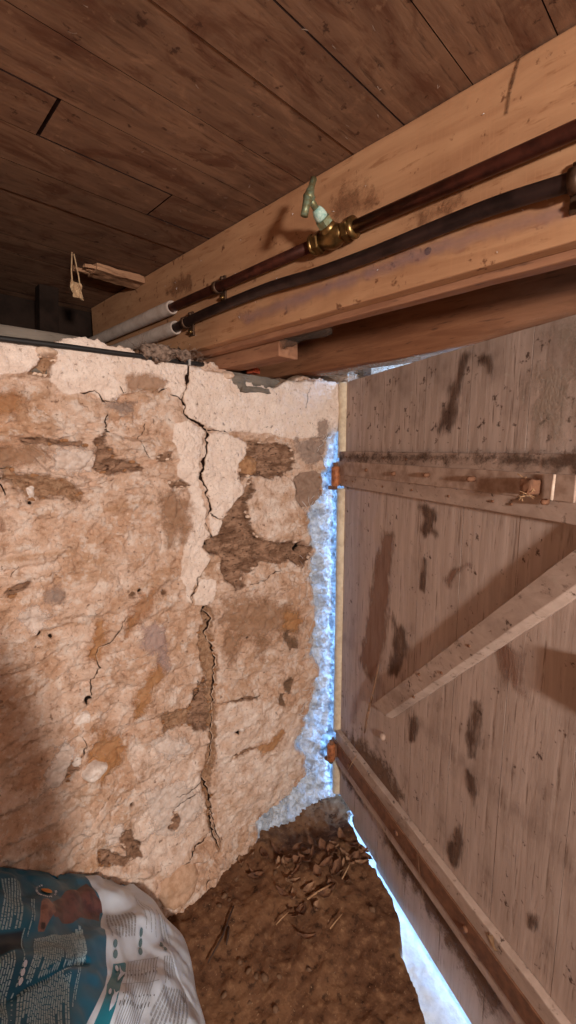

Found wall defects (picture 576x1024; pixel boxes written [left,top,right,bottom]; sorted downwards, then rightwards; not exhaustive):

damp [437,352,493,432]
spalling [20,432,144,475]
crack [158,366,226,537]
damp [295,419,328,464]
spalling [203,441,312,590]
crack [90,617,129,696]
crack [174,567,257,886]
damp [218,591,303,667]
damp [258,730,285,755]
damp [279,677,293,706]